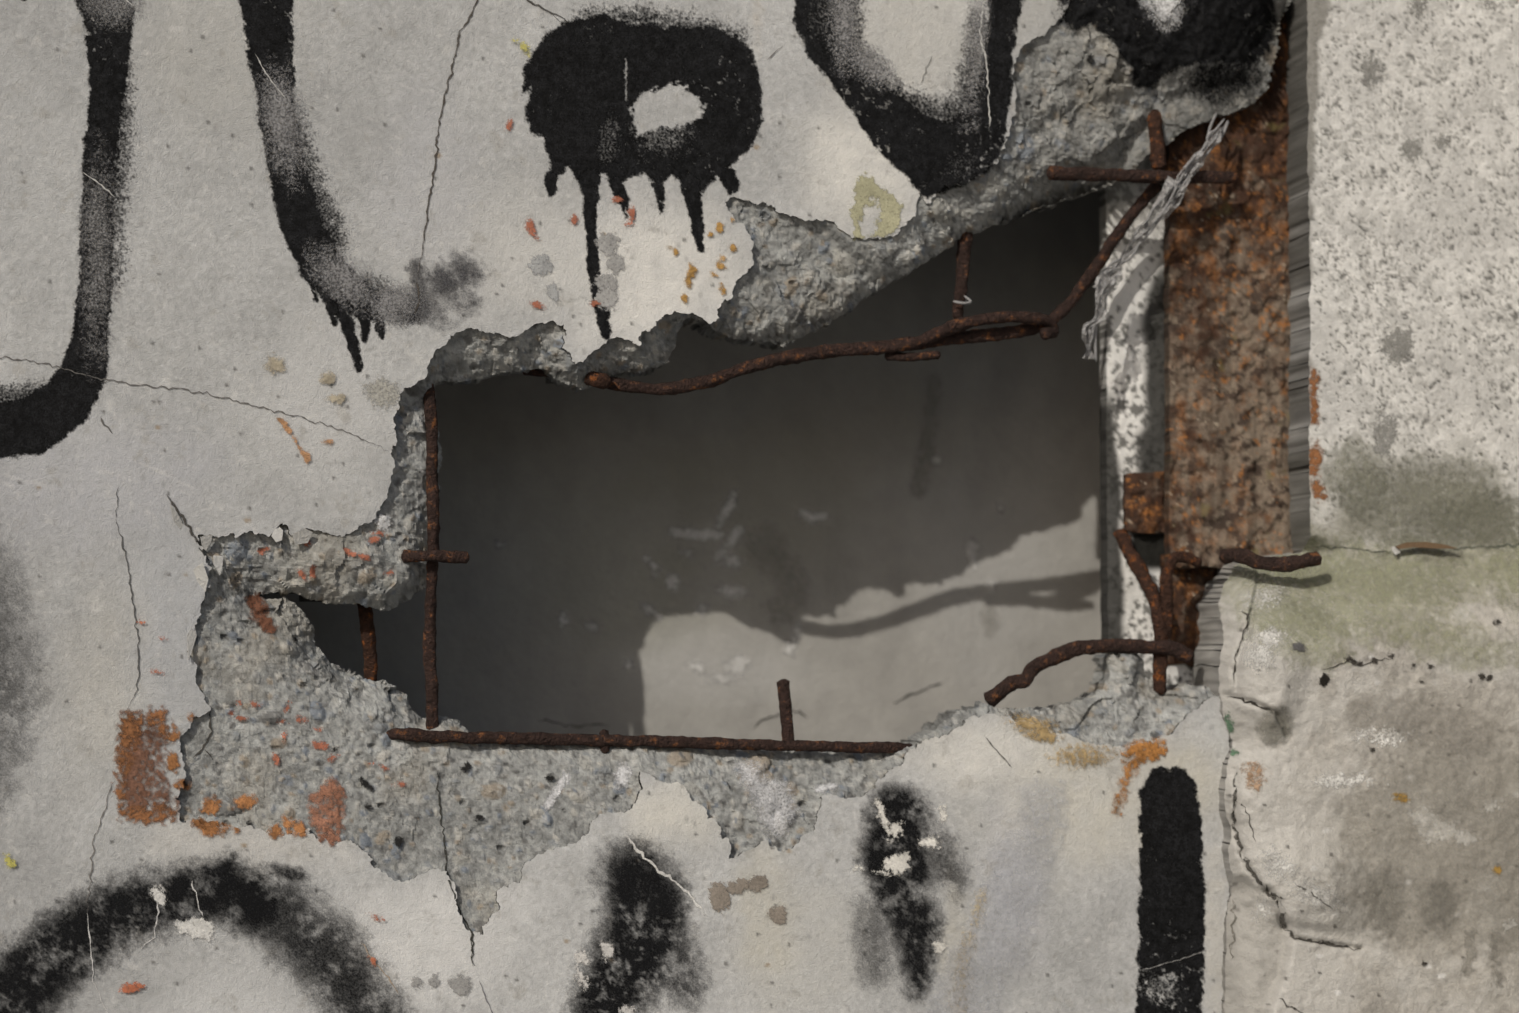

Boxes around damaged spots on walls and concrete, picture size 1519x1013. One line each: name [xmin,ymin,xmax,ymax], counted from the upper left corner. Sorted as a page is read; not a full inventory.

crack [527,0,567,26]
crack [414,0,478,313]
rust [674,218,737,303]
crack [0,356,388,451]
spalling [170,0,1322,935]
crack [1228,608,1270,710]
crack [1324,658,1390,670]
rust [113,710,258,837]
crack [1229,772,1356,958]
peeling [1252,844,1343,922]
peeling [932,940,948,954]